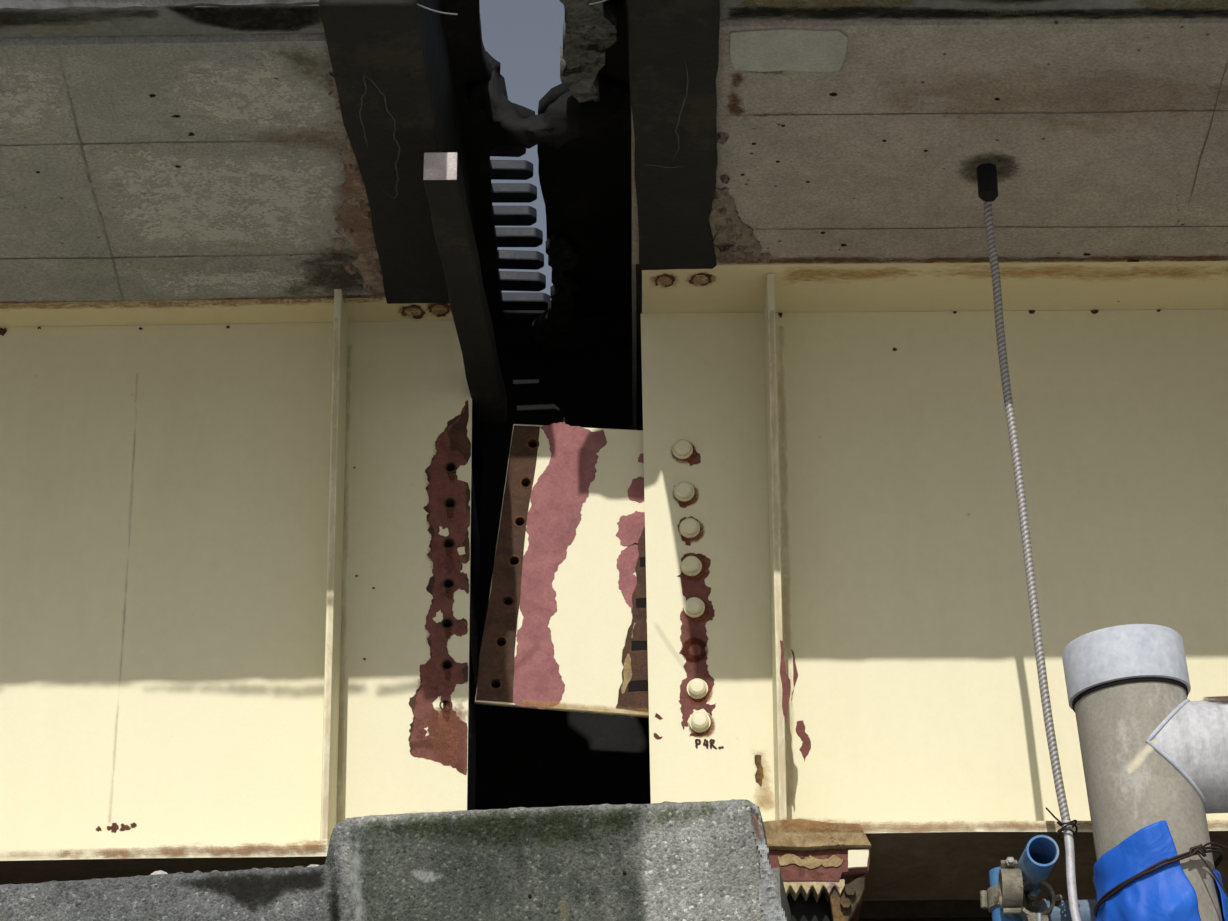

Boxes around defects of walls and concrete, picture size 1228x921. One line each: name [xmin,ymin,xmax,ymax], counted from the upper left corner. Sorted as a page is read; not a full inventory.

spalling [559,0,617,103]
damp [0,61,70,138]
damp [167,55,329,133]
damp [91,146,363,299]
rust [653,273,715,287]
rust [719,256,1228,281]
peeling [616,453,645,613]
rust [674,488,699,506]
rust [525,527,649,715]
rust [682,638,708,662]
rust [688,683,714,737]
spalling [750,803,787,921]